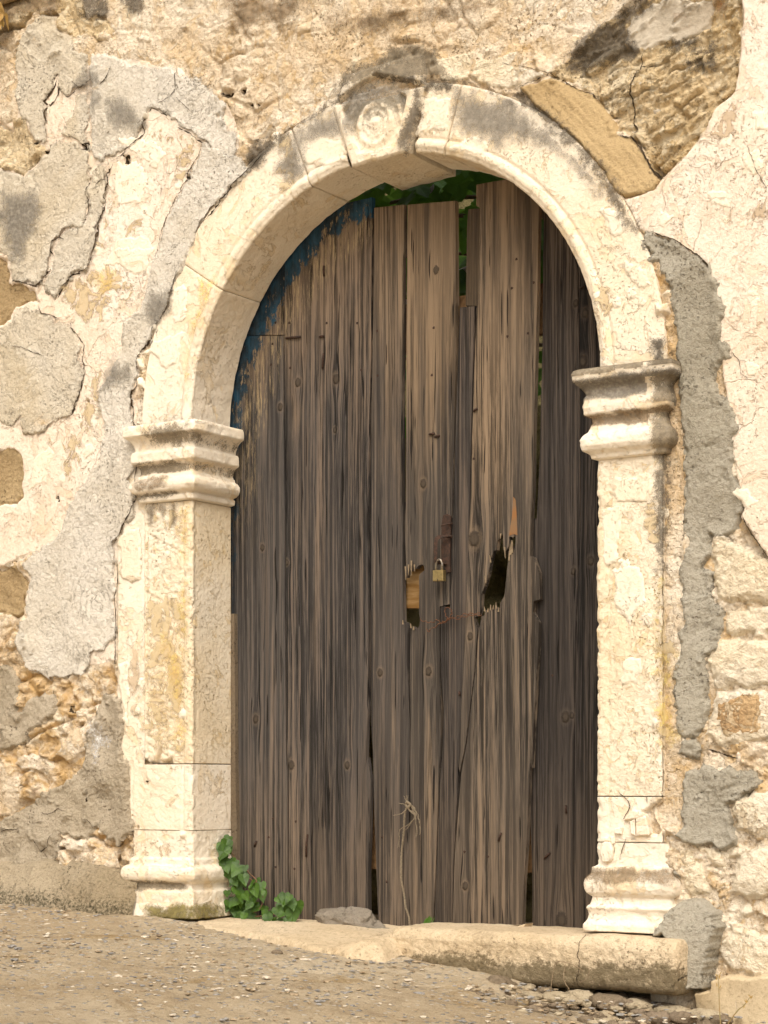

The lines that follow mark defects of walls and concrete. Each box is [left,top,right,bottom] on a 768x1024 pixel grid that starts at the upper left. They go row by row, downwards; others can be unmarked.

flaking render [0,0,115,43]
flaking render [0,117,48,176]
crack [620,47,663,179]
flaking render [550,0,743,176]
peeling [60,127,199,324]
flaking render [0,258,38,326]
peeling [137,285,188,369]
flaking render [0,447,24,506]
peeling [732,488,758,509]
flaking render [0,563,30,618]
peeling [118,594,190,752]
flaking render [717,692,761,737]